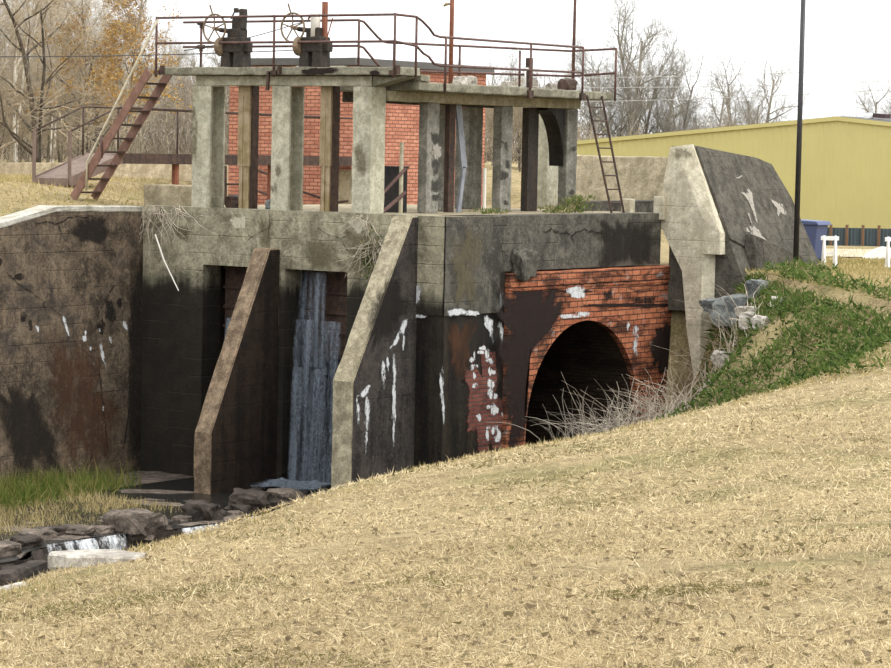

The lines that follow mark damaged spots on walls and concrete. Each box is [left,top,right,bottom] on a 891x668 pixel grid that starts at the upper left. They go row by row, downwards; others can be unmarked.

leakage [1,386,62,472]
efflorescence [356,385,370,443]
leakage [370,279,426,441]
peeling [465,344,503,453]